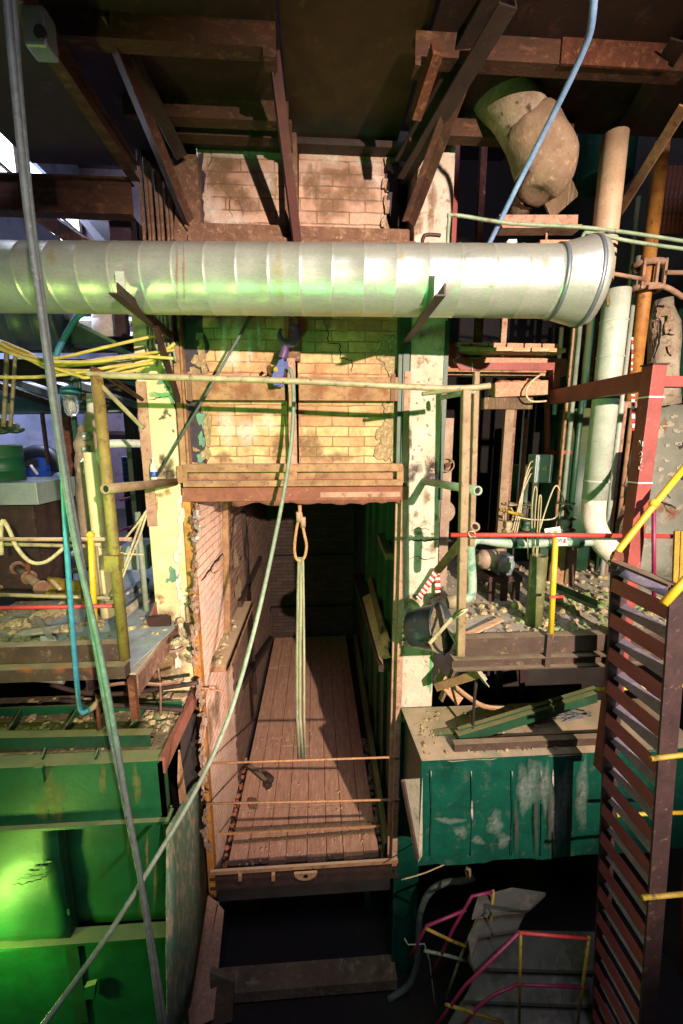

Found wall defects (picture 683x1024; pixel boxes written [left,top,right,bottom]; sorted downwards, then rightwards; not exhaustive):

spalling [381,156,402,229]
crack [323,318,353,372]
flaking render [373,402,396,463]
spalling [166,495,219,852]